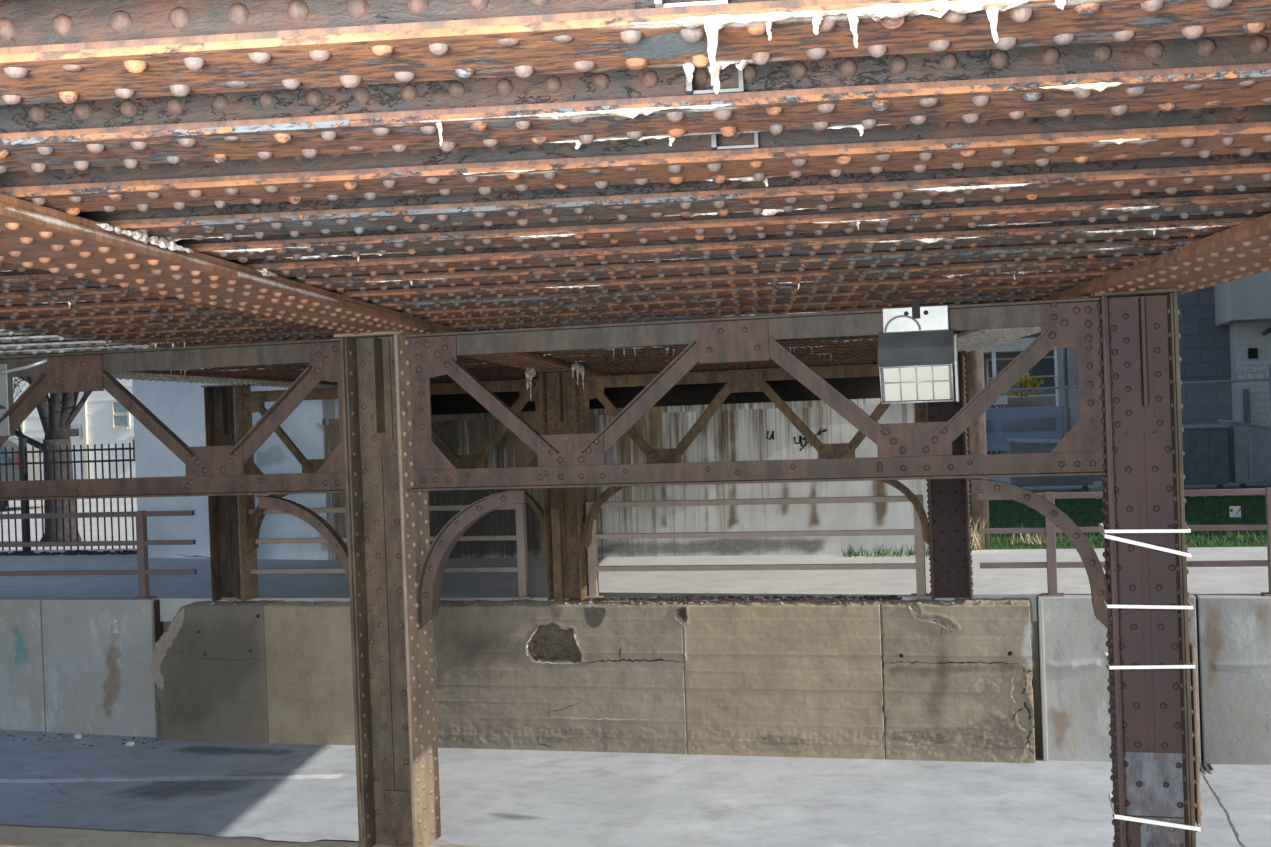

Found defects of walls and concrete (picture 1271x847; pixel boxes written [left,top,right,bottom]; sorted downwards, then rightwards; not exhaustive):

water stain [1054,0,1091,10]
water stain [420,0,1031,146]
water stain [1040,82,1122,92]
water stain [524,367,536,399]
spalling [526,623,582,664]
spalling [150,608,185,736]